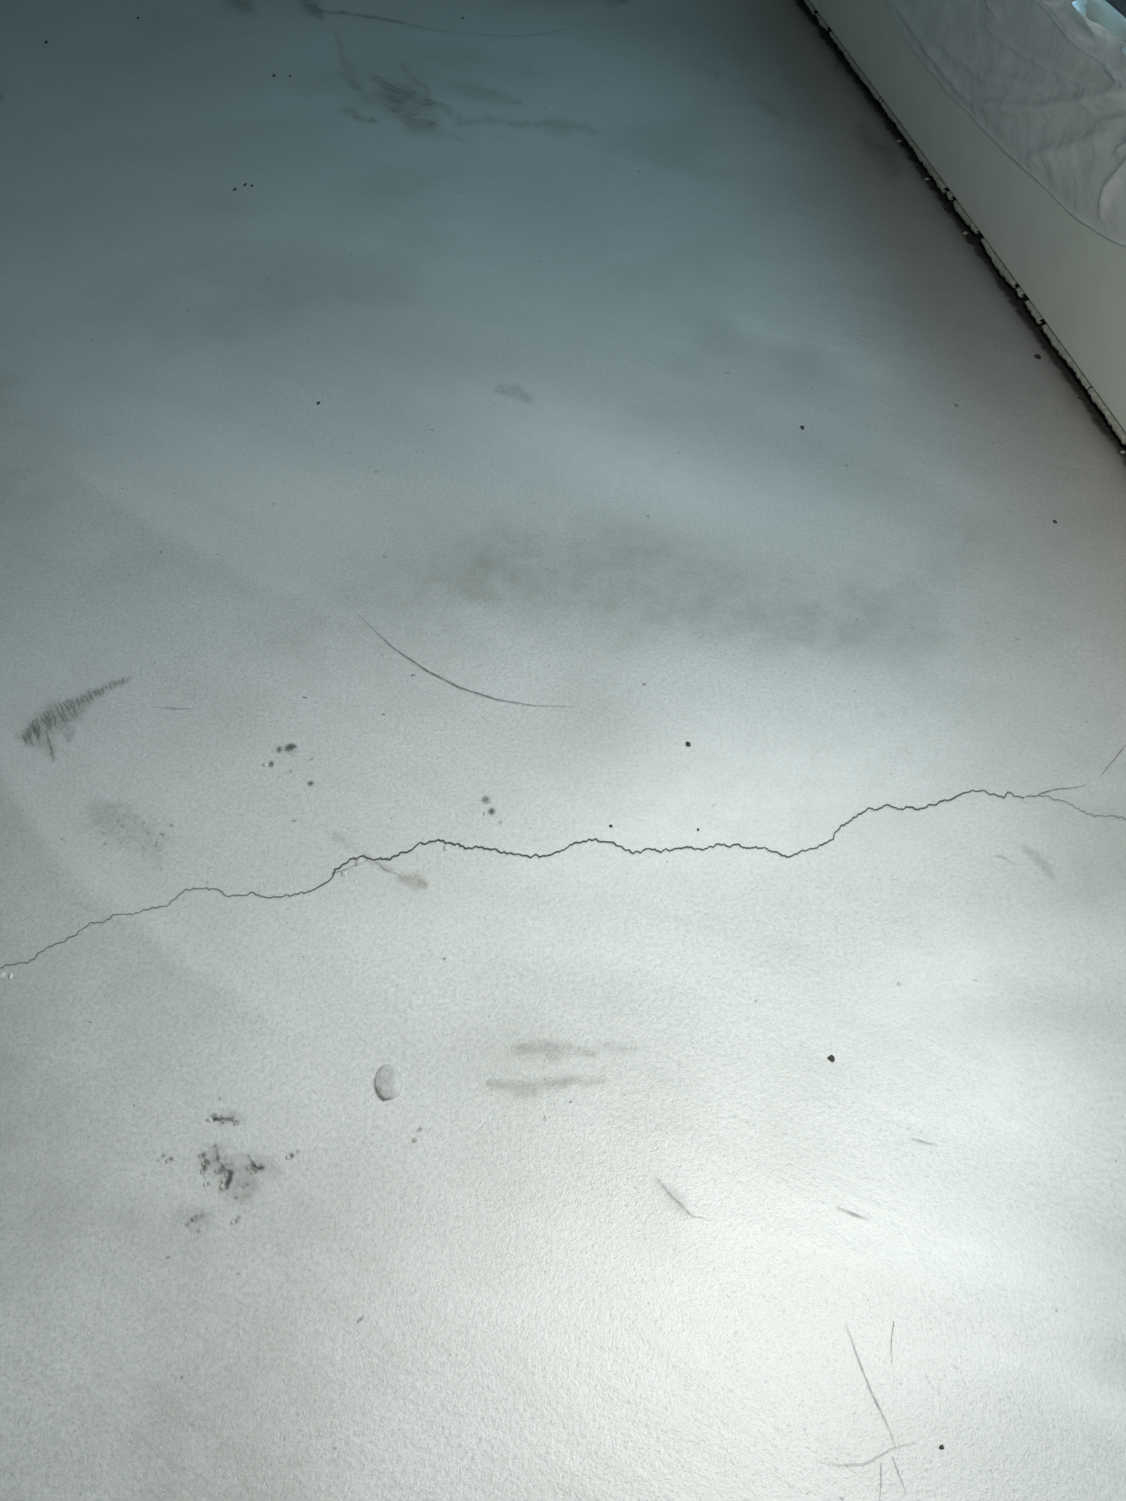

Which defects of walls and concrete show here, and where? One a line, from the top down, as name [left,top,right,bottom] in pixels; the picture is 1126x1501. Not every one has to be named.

crack [0,788,1125,980]